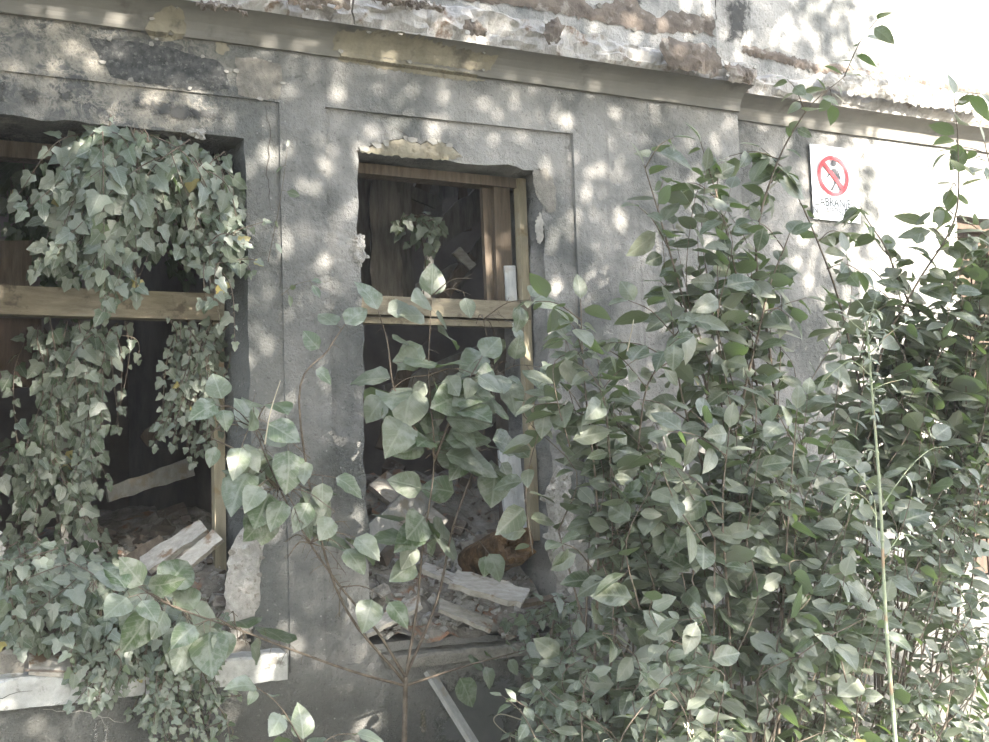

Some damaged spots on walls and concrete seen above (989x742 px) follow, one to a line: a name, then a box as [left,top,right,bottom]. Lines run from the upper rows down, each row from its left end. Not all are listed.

flaking render [454,0,716,36]
flaking render [89,5,239,91]
flaking render [333,29,499,82]
flaking render [742,45,989,96]
water stain [136,100,222,122]
flaking render [359,136,462,160]